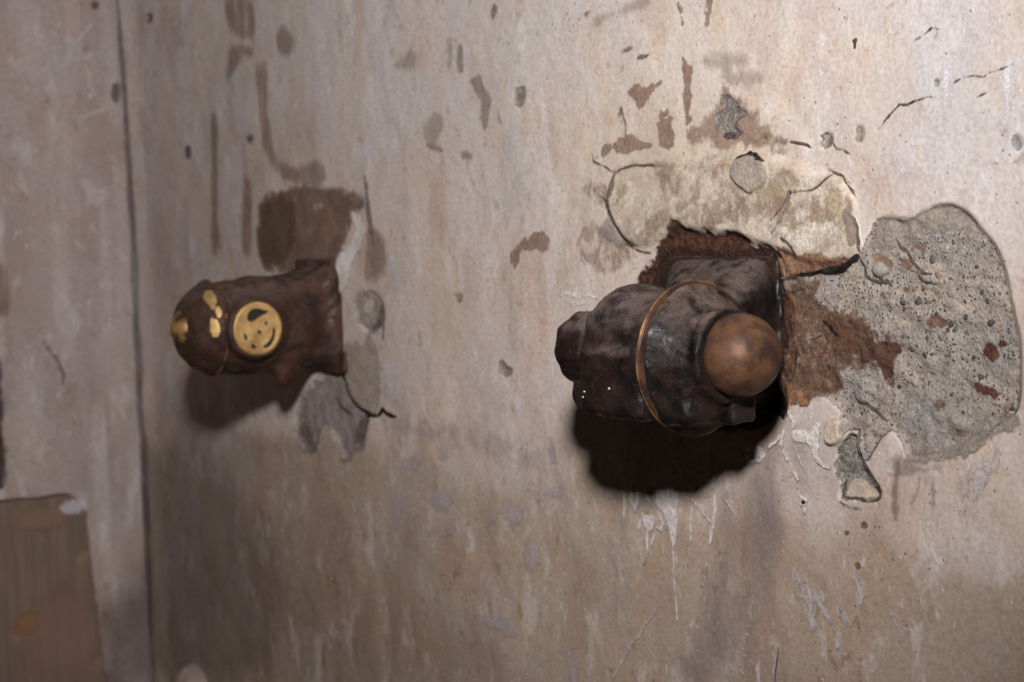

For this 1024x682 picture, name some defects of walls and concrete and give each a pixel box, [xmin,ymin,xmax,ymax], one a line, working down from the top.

peeling [601,57,779,158]
crack [878,96,933,129]
crack [592,156,674,253]
crack [736,125,892,292]
spalling [293,290,385,462]
corrosion [637,219,902,432]
crack [812,321,865,355]
spalling [786,203,1021,501]